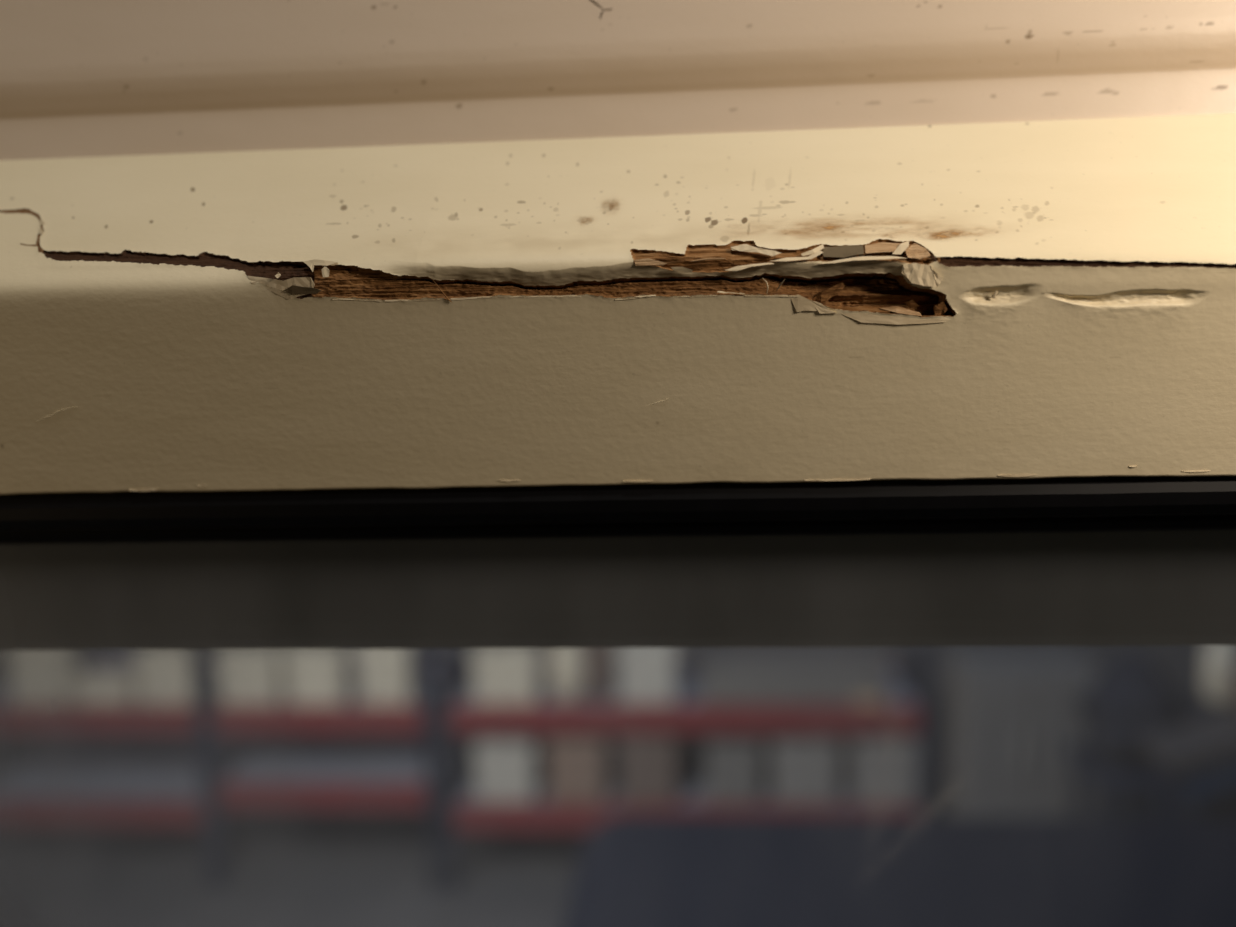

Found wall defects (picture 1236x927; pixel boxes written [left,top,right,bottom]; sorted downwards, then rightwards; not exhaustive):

crack [0,208,1236,325]
peeling [630,239,940,273]